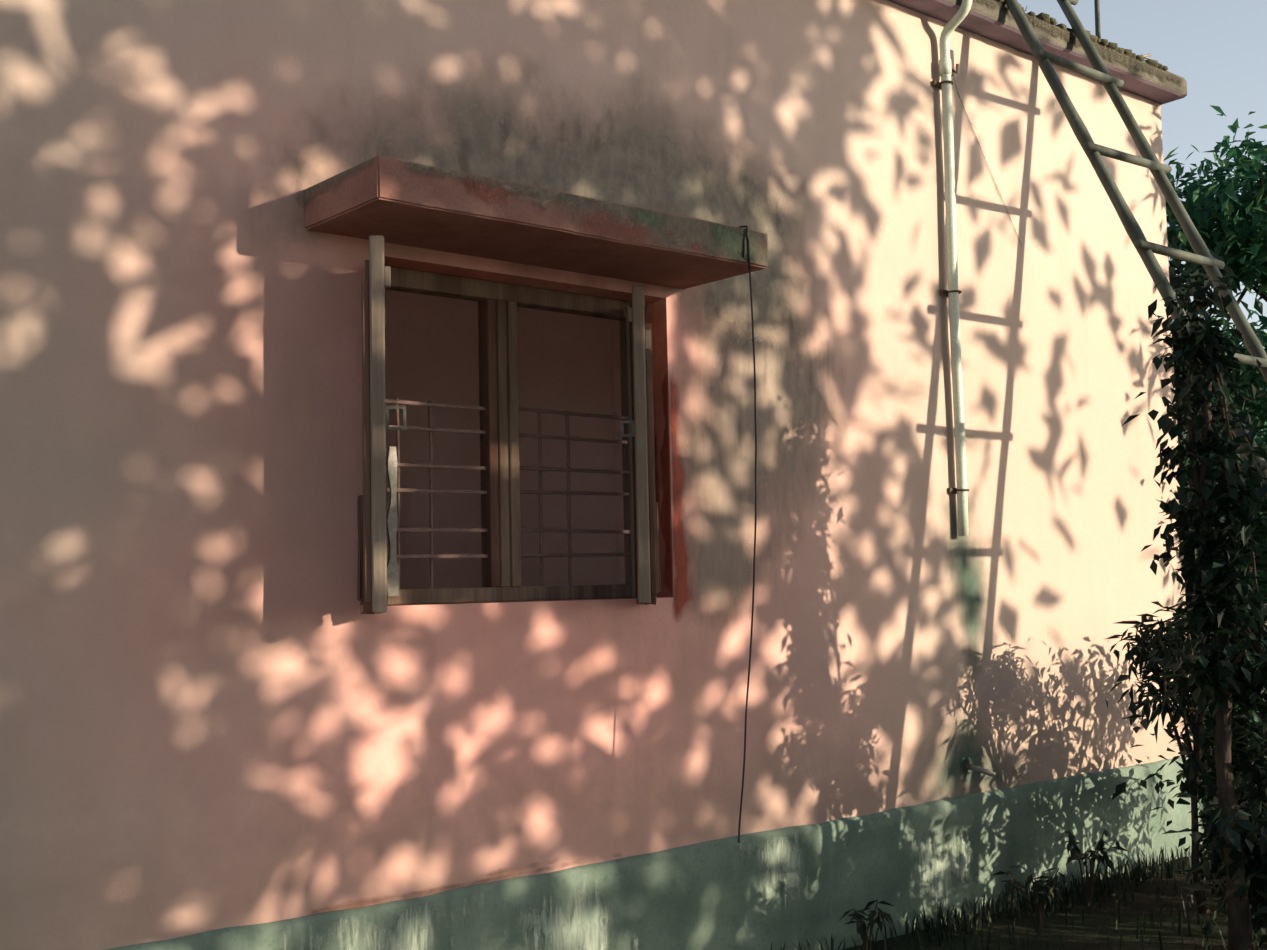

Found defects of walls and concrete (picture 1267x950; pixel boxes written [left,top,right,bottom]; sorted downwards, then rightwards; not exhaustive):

water stain [361,99,821,604]
corrosion [654,376,691,618]